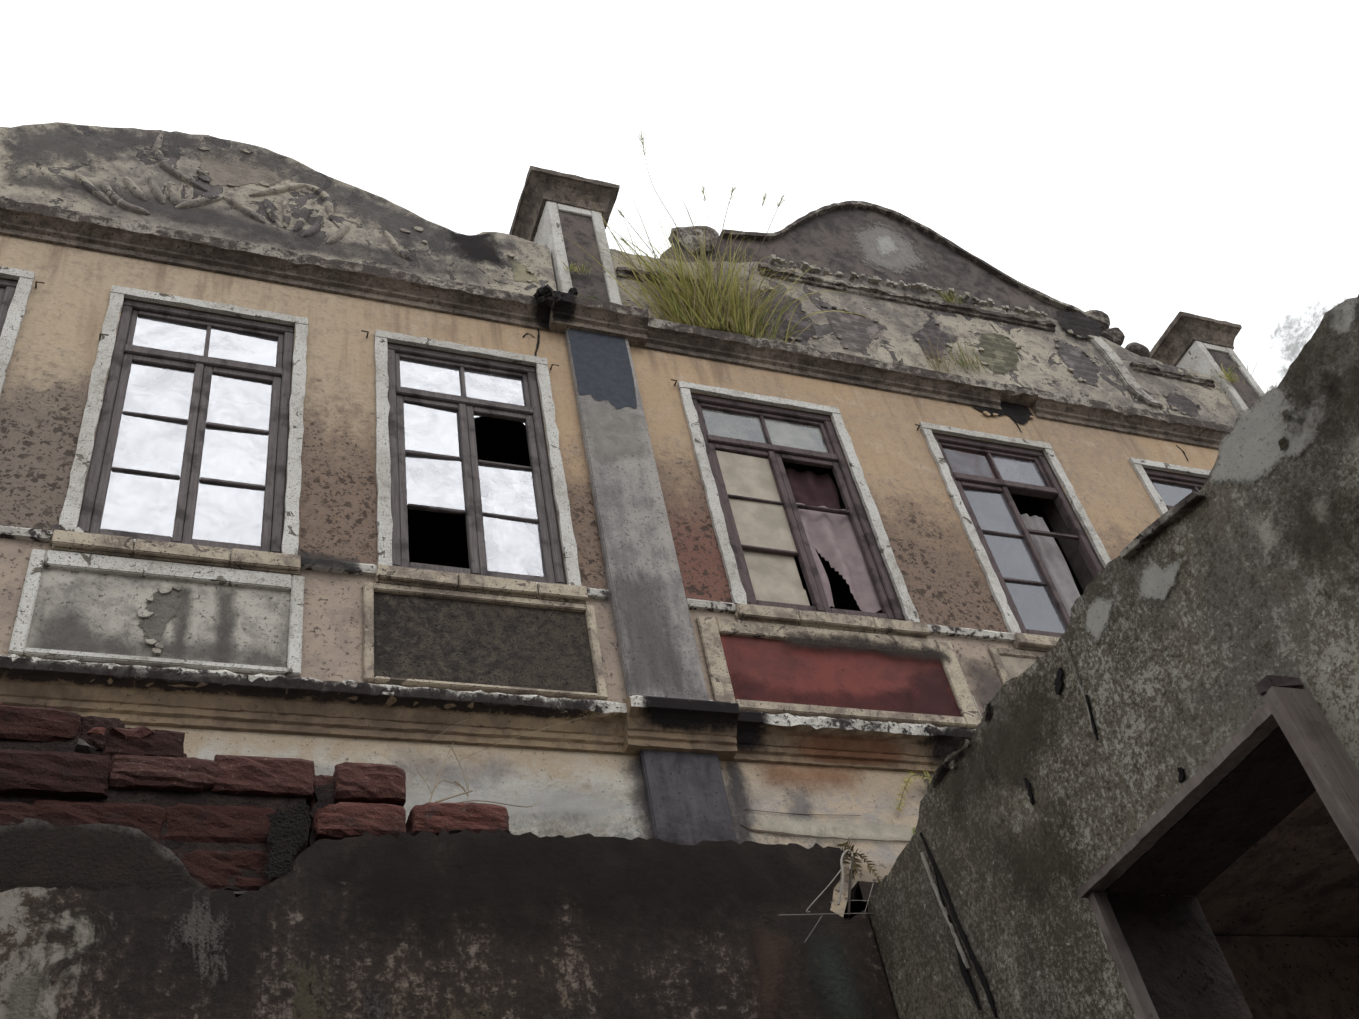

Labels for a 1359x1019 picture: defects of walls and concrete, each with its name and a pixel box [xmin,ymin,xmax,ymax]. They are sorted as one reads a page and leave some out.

peeling [568,329,637,409]
spalling [749,287,888,355]
spalling [978,333,1022,374]
spalling [1054,310,1103,388]
peeling [1210,385,1329,485]
peeling [1139,558,1181,601]
spalling [137,585,182,655]
peeling [1086,598,1114,643]
crack [1054,639,1099,741]
leakage [364,579,1056,932]
leakage [0,821,227,987]
crack [741,809,997,1018]